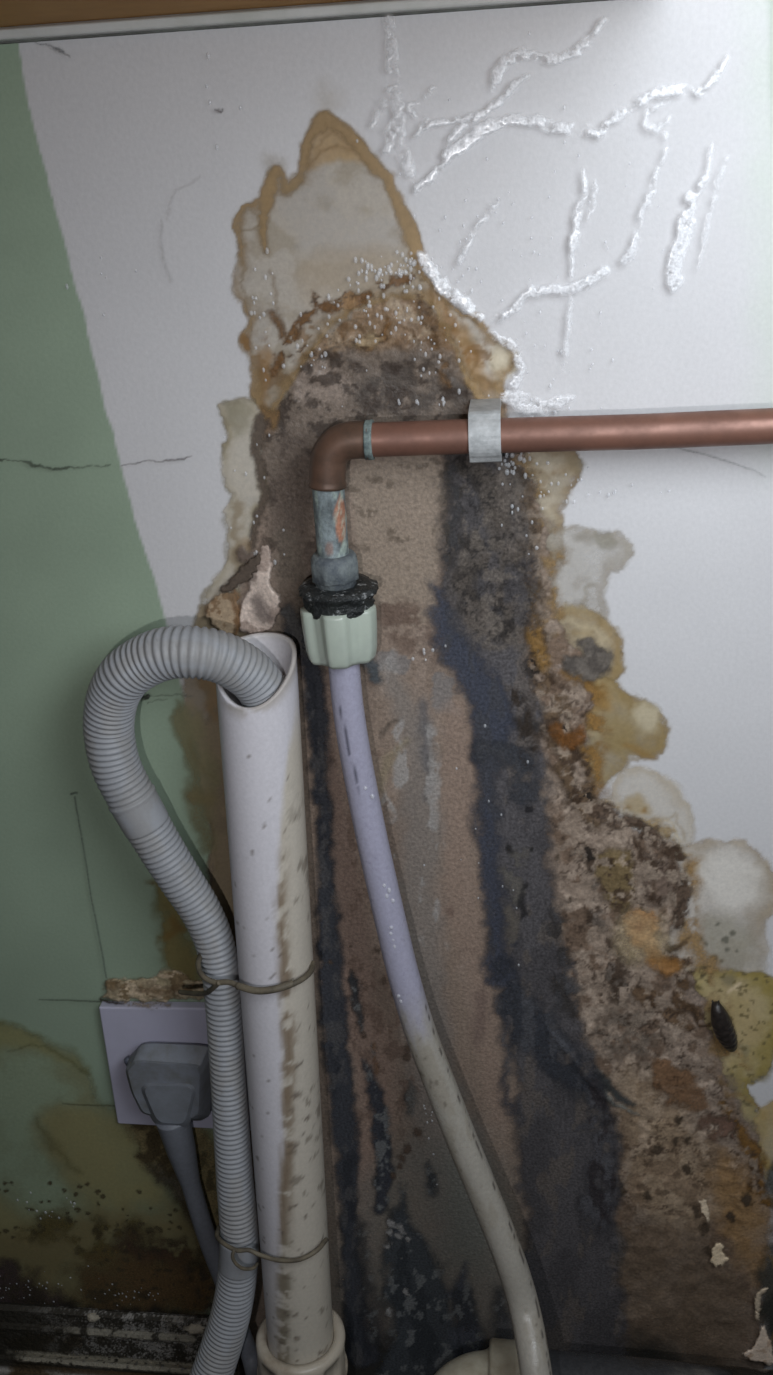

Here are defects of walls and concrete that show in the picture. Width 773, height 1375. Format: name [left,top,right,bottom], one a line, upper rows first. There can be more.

crack [0,459,70,470]
flaking render [205,291,477,636]
damp [194,16,729,637]
damp [0,1022,219,1316]
spalling [100,970,204,1008]
damp [172,677,236,946]
flaking render [249,1130,266,1344]
flaking render [297,655,514,1375]
flaking render [345,455,534,1251]
damp [428,451,773,1356]
flaking render [509,453,773,1369]